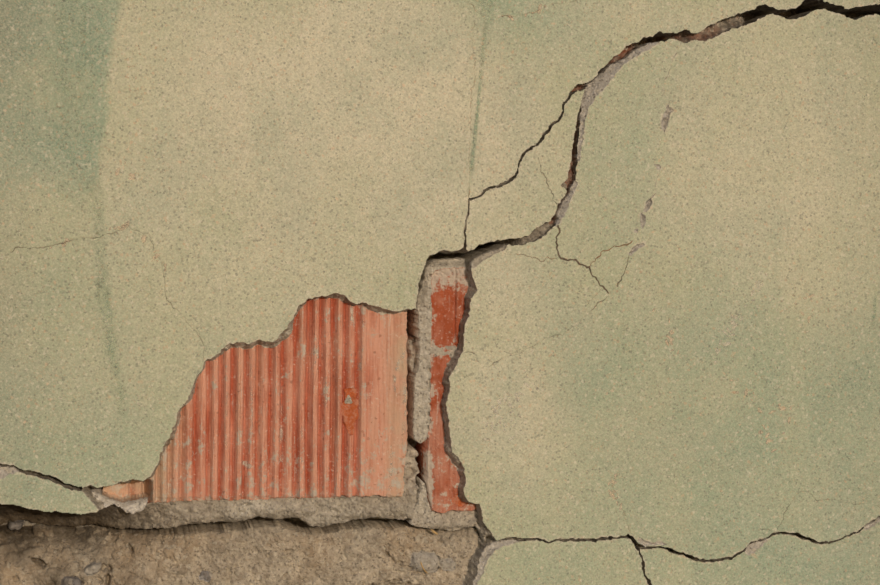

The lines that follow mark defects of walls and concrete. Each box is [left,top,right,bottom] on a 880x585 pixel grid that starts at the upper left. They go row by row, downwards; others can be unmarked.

crack [429,0,880,294]
spalling [82,293,415,512]
spalling [417,240,519,585]
crack [0,463,82,491]
crack [407,436,417,460]
crack [3,518,44,526]
crack [283,516,306,524]
crack [489,516,880,585]